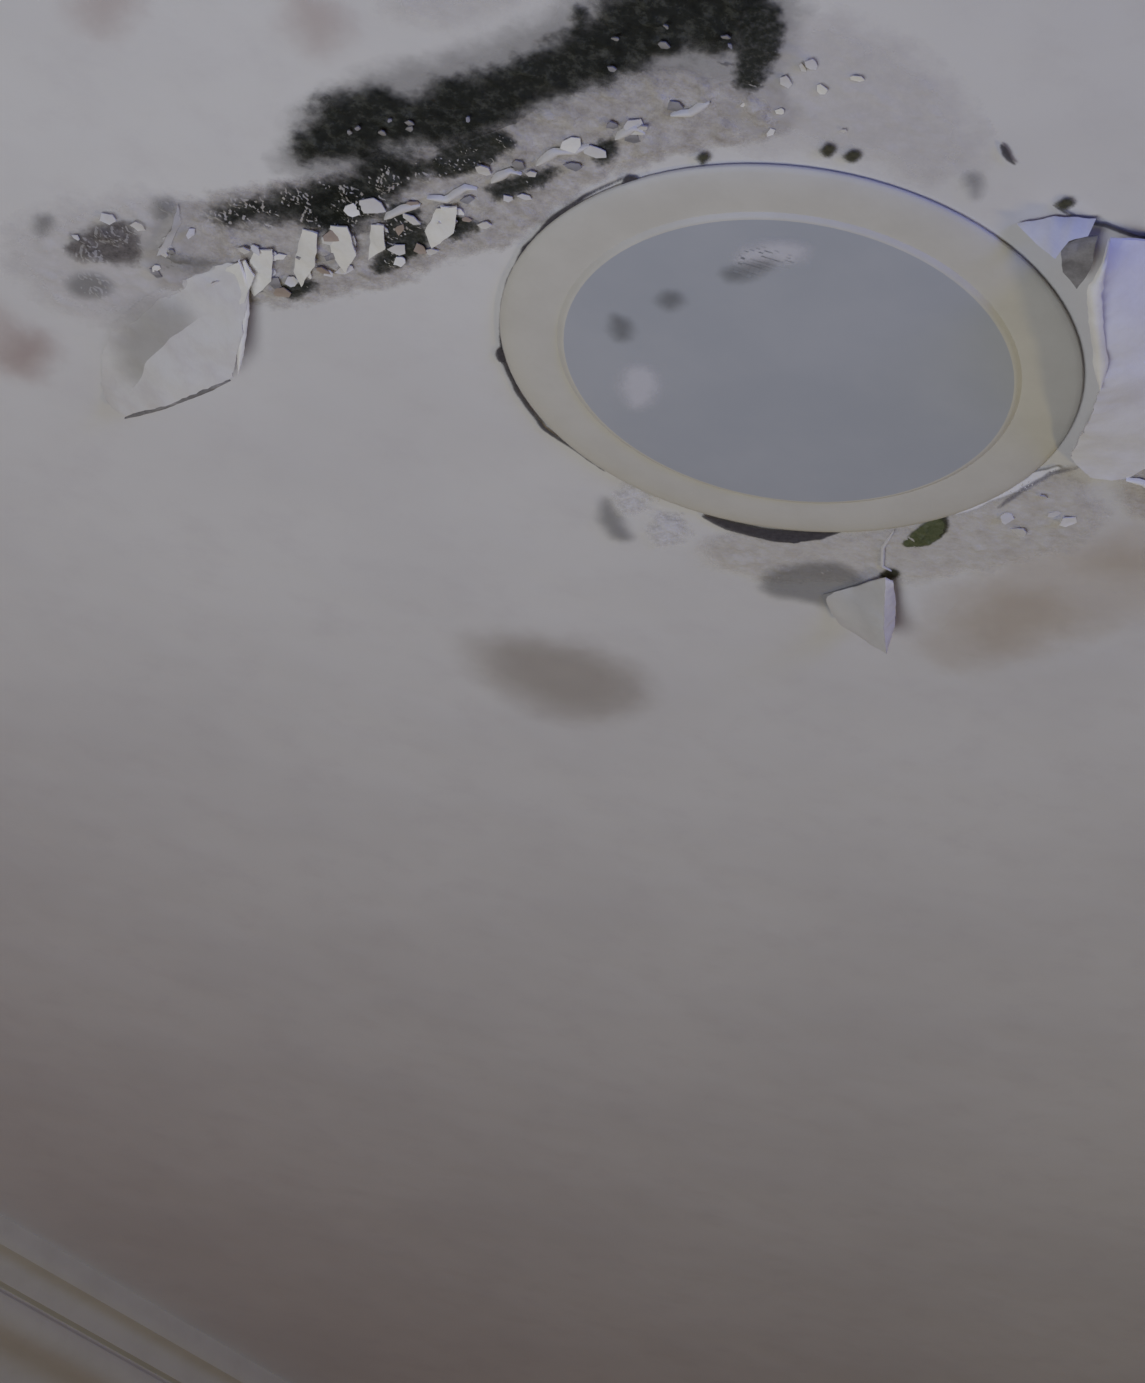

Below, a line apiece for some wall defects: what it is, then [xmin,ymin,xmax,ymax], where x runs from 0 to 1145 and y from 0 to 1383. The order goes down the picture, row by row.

water stain [283,280,318,299]
spalling [100,59,828,419]
water stain [217,0,785,274]
spalling [709,216,1145,654]